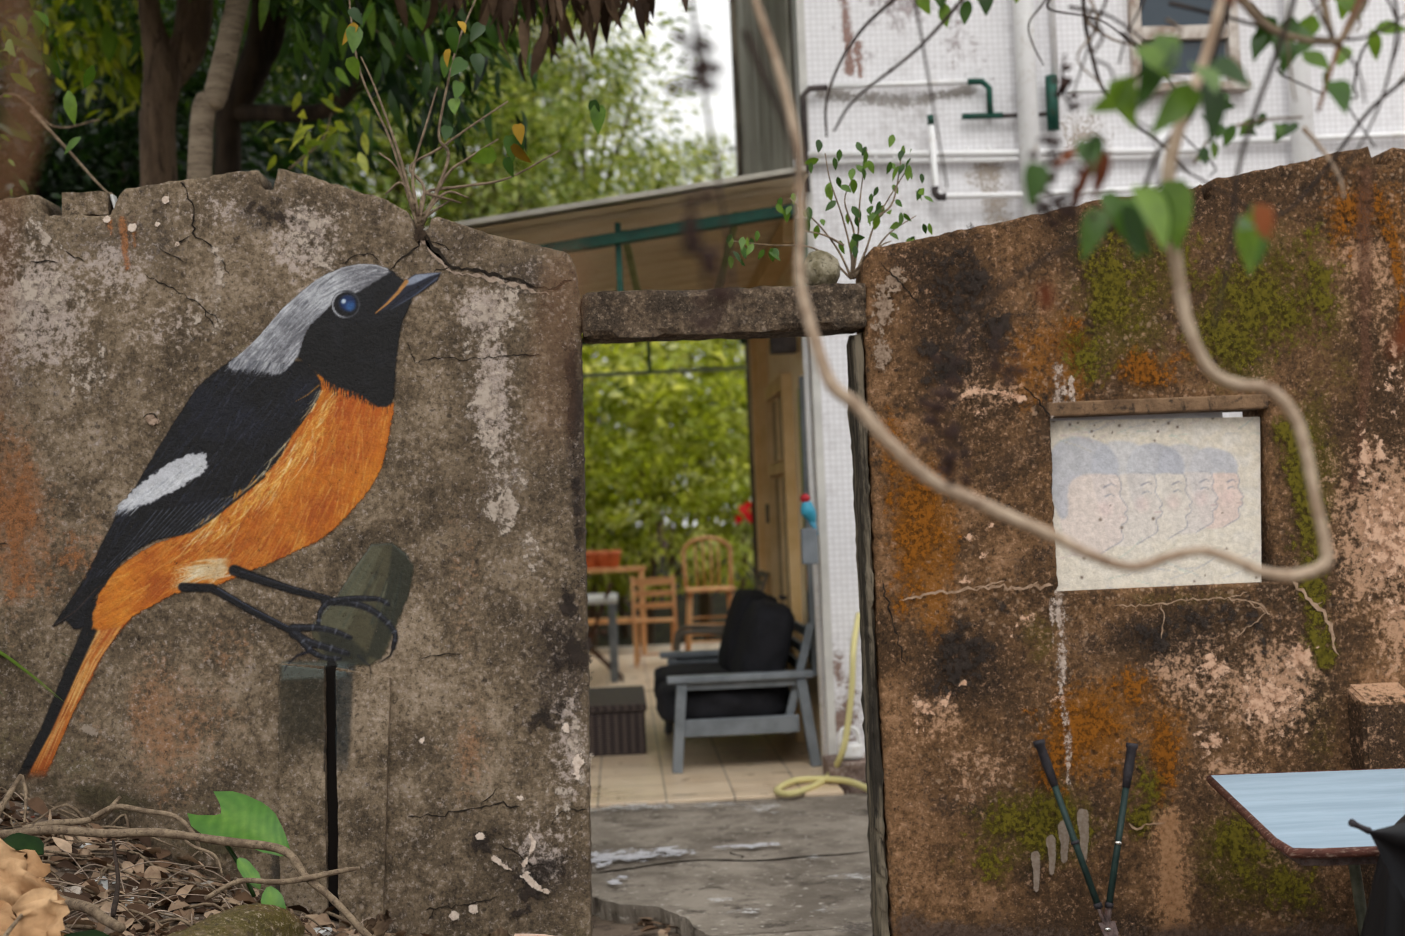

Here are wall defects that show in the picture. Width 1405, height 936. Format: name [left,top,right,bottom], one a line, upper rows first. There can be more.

crack [145,182,230,325]
crack [344,234,572,295]
corrosion [882,405,962,619]
crack [882,580,1052,665]
crack [1115,592,1271,637]
crack [1293,581,1340,656]
peeling [572,753,585,780]
damp [1049,590,1072,787]
corrosion [1022,663,1161,799]
corrosion [1149,714,1182,809]
spalling [491,833,550,894]
damp [1124,806,1359,936]